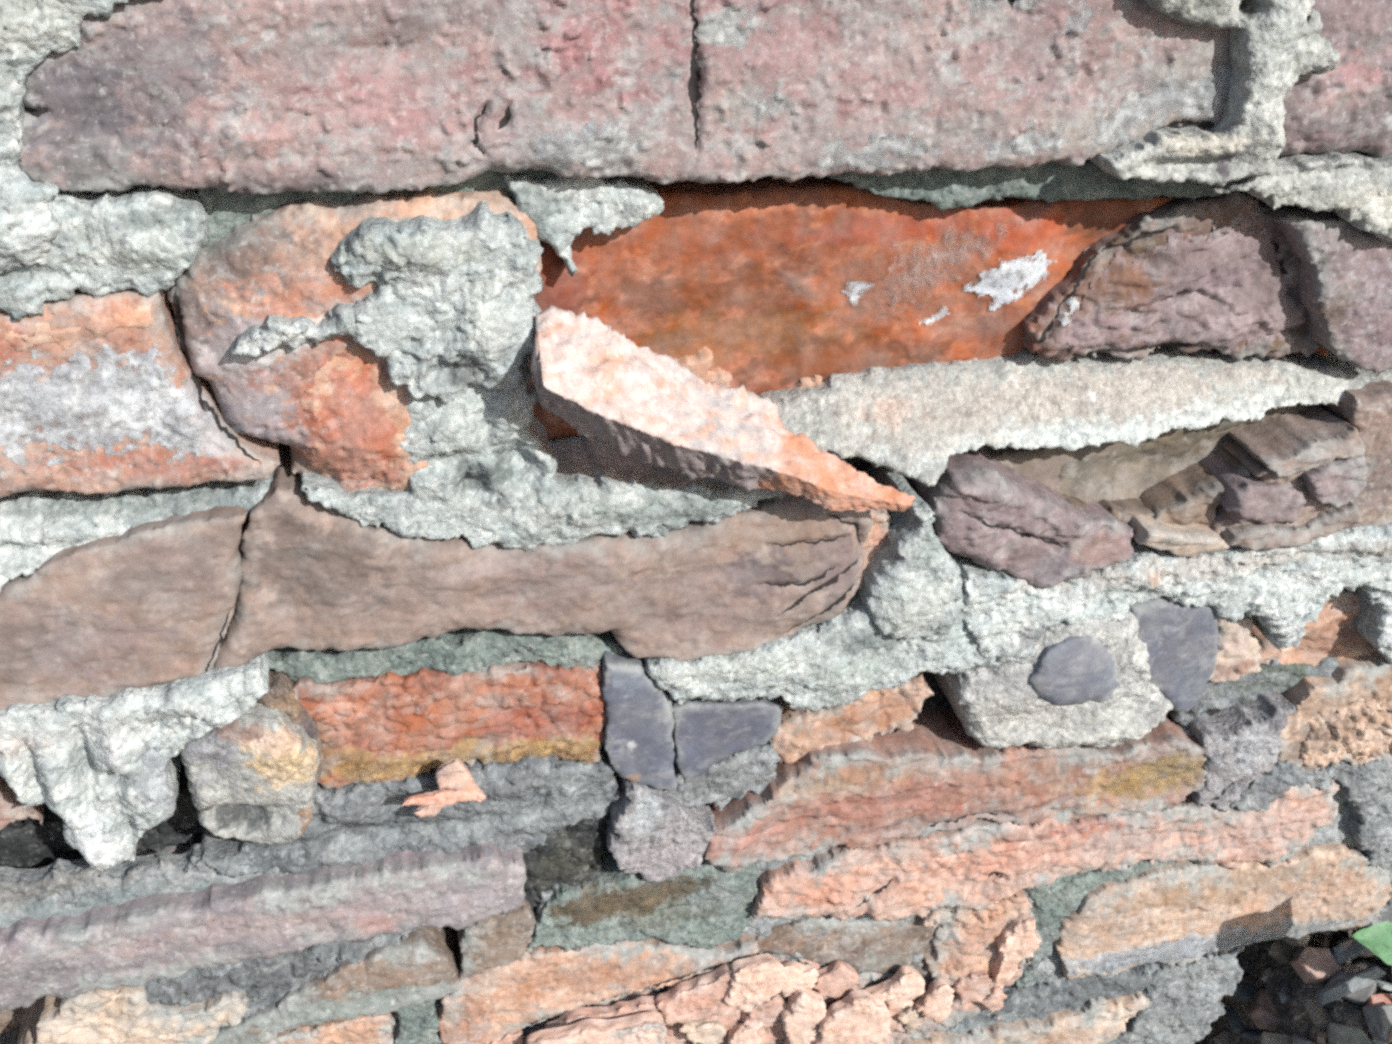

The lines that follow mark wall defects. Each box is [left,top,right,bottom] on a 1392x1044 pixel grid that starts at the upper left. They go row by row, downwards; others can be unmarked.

crack [688,0,702,147]
crack [205,611,230,673]